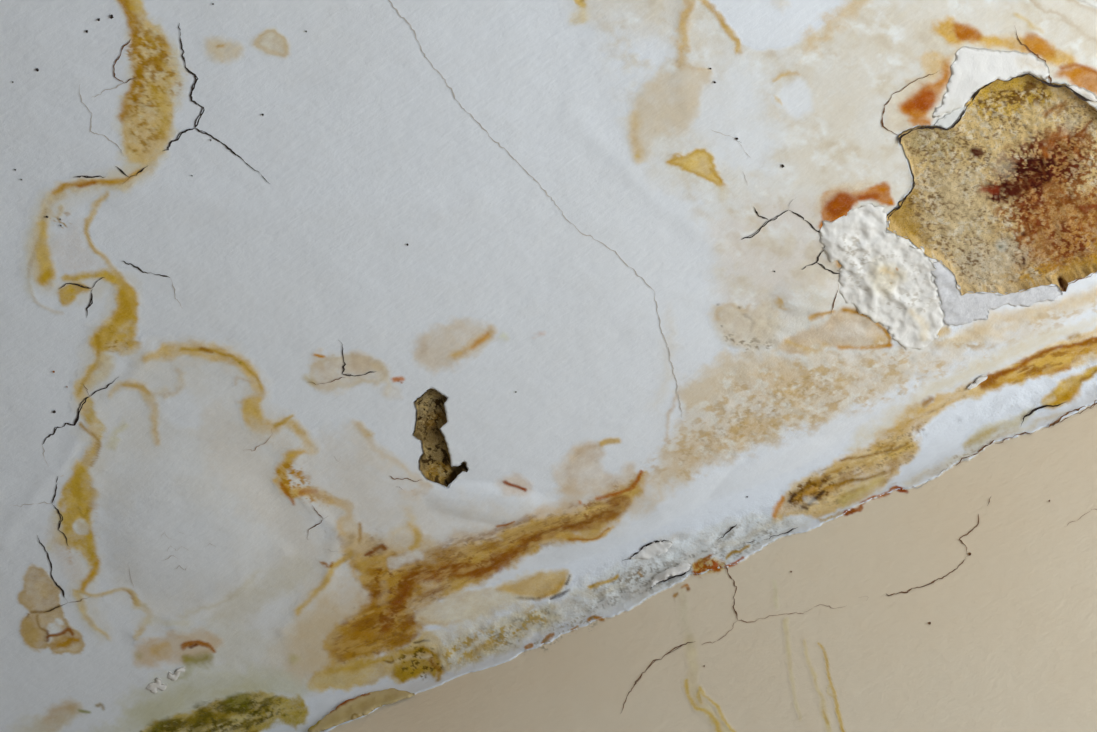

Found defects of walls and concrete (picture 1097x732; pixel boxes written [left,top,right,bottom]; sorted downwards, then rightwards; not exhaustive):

crack [10,378,117,612]
crack [76,23,270,184]
damp [0,0,666,732]
spalling [414,388,468,487]
crack [388,0,682,416]
damp [550,0,1097,525]
corrosion [808,173,899,231]
spalling [819,46,1097,350]
flaking render [967,376,988,390]
flaking render [899,408,1074,490]
corrosion [879,12,1097,137]
crack [620,497,991,714]